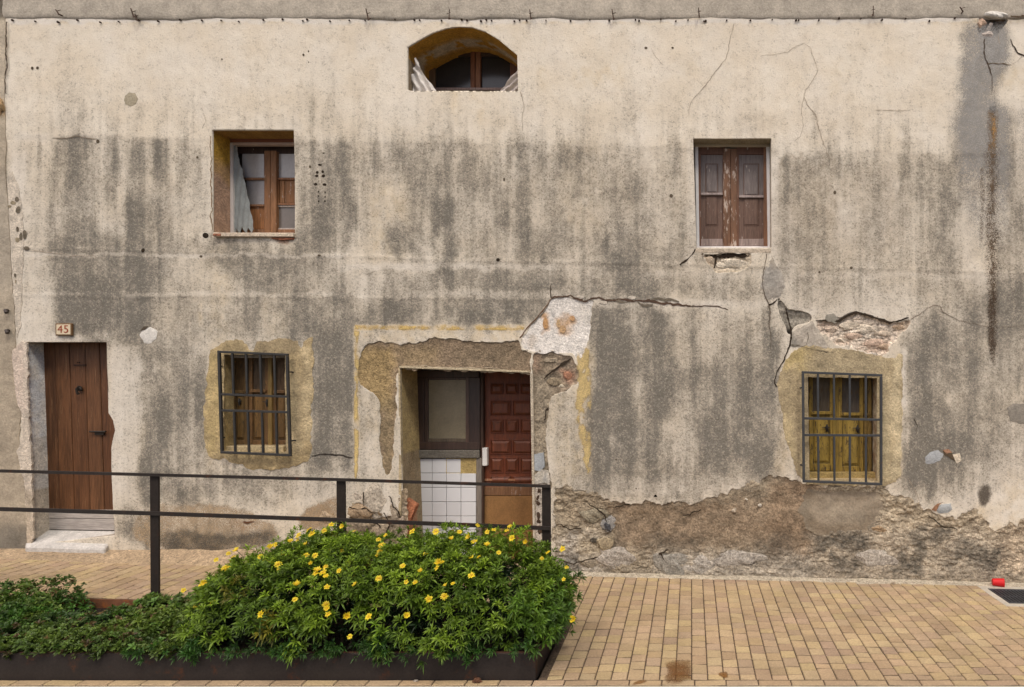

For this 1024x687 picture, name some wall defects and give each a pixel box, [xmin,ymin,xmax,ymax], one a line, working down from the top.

crack [689,24,734,108]
crack [762,44,829,158]
water stain [954,21,1013,245]
crack [983,15,1024,88]
crack [519,285,728,338]
spalling [702,253,751,273]
crack [762,254,826,387]
spalling [300,297,1024,583]